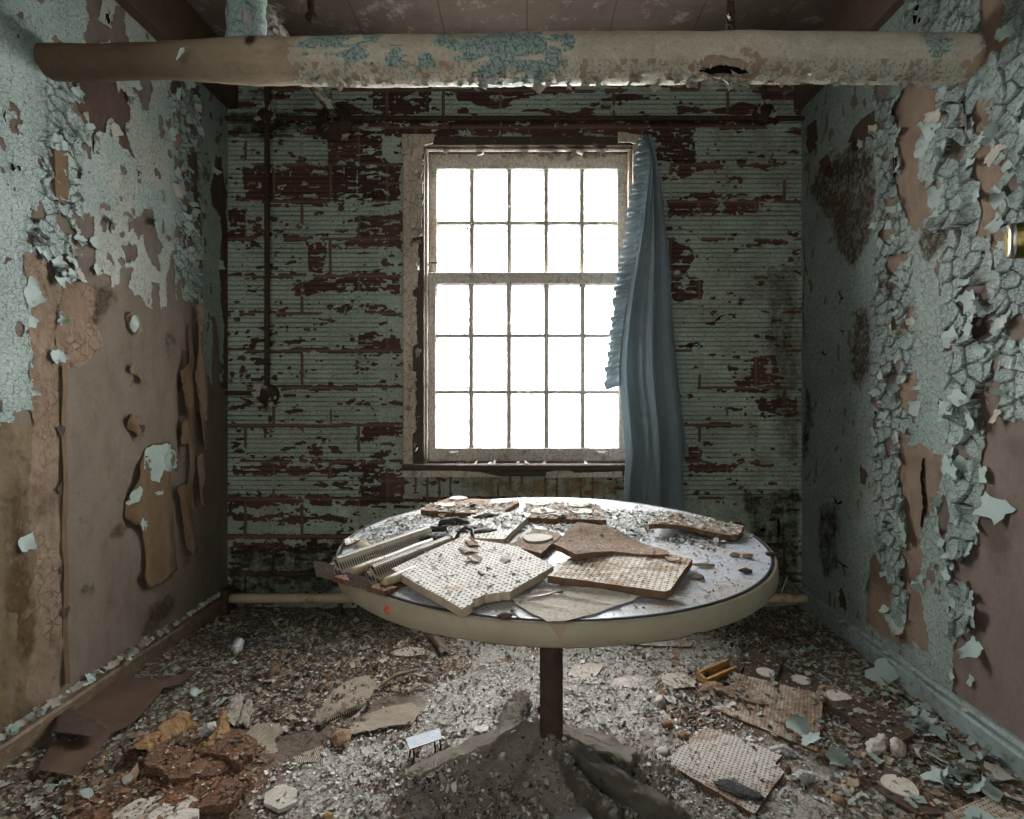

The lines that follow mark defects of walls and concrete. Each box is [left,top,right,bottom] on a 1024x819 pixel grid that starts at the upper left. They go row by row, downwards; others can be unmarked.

peeling [83,0,129,44]
peeling [75,80,153,158]
peeling [294,31,576,87]
flaking render [169,87,789,389]
damp [810,142,876,267]
peeling [878,85,938,240]
peeling [966,90,1016,251]
peeling [961,308,1004,345]
peeling [0,201,423,819]
peeling [230,439,766,575]
crack [919,458,927,527]
peeling [862,399,1024,742]